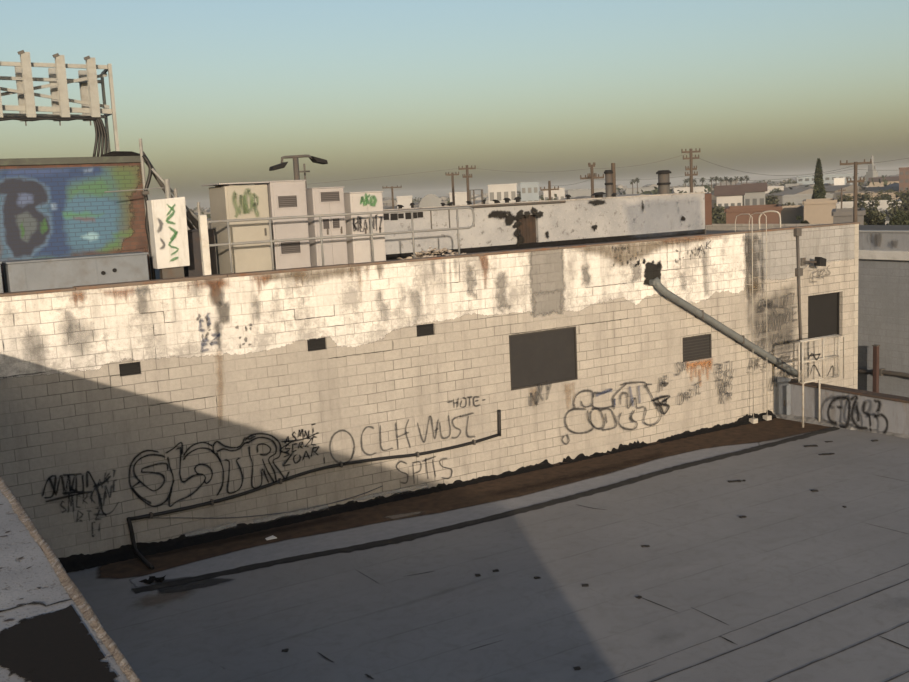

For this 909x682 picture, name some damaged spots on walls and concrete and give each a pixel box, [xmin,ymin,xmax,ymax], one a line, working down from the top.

spalling [513,207,544,246]
peeling [467,267,477,297]
peeling [496,272,510,309]
peeling [530,249,565,317]
spalling [612,247,662,286]
peeling [0,605,118,682]